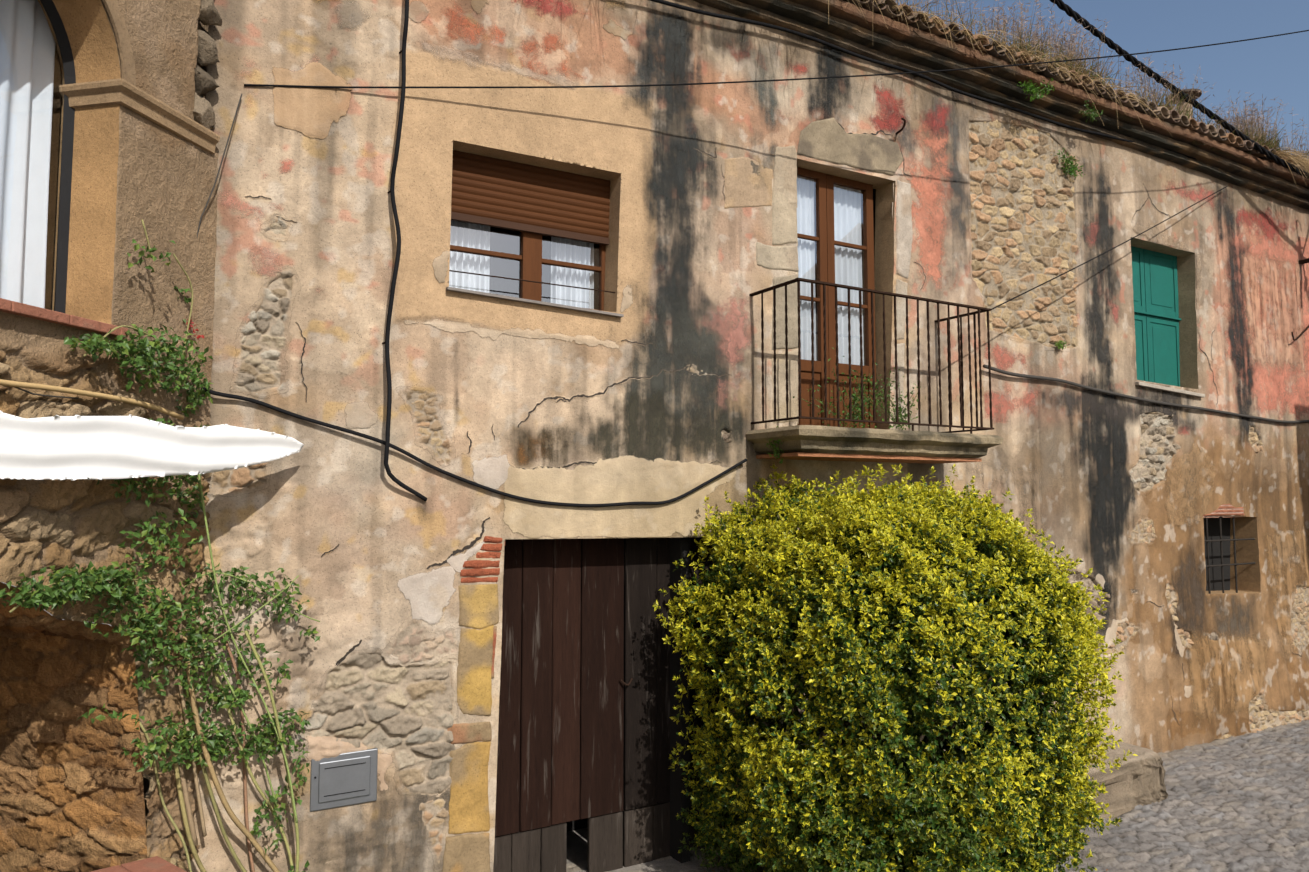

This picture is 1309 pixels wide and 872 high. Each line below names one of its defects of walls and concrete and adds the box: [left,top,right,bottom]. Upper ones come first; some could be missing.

water stain [588,8,777,461]
spalling [222,192,301,399]
peeling [703,299,749,365]
spalling [685,361,734,404]
spalling [396,384,456,467]
water stain [516,434,552,463]
peeling [472,454,736,538]
spalling [721,425,735,448]
spalling [1127,408,1215,546]
spalling [1287,581,1309,656]
spalling [288,542,484,869]
spalling [1210,685,1309,742]